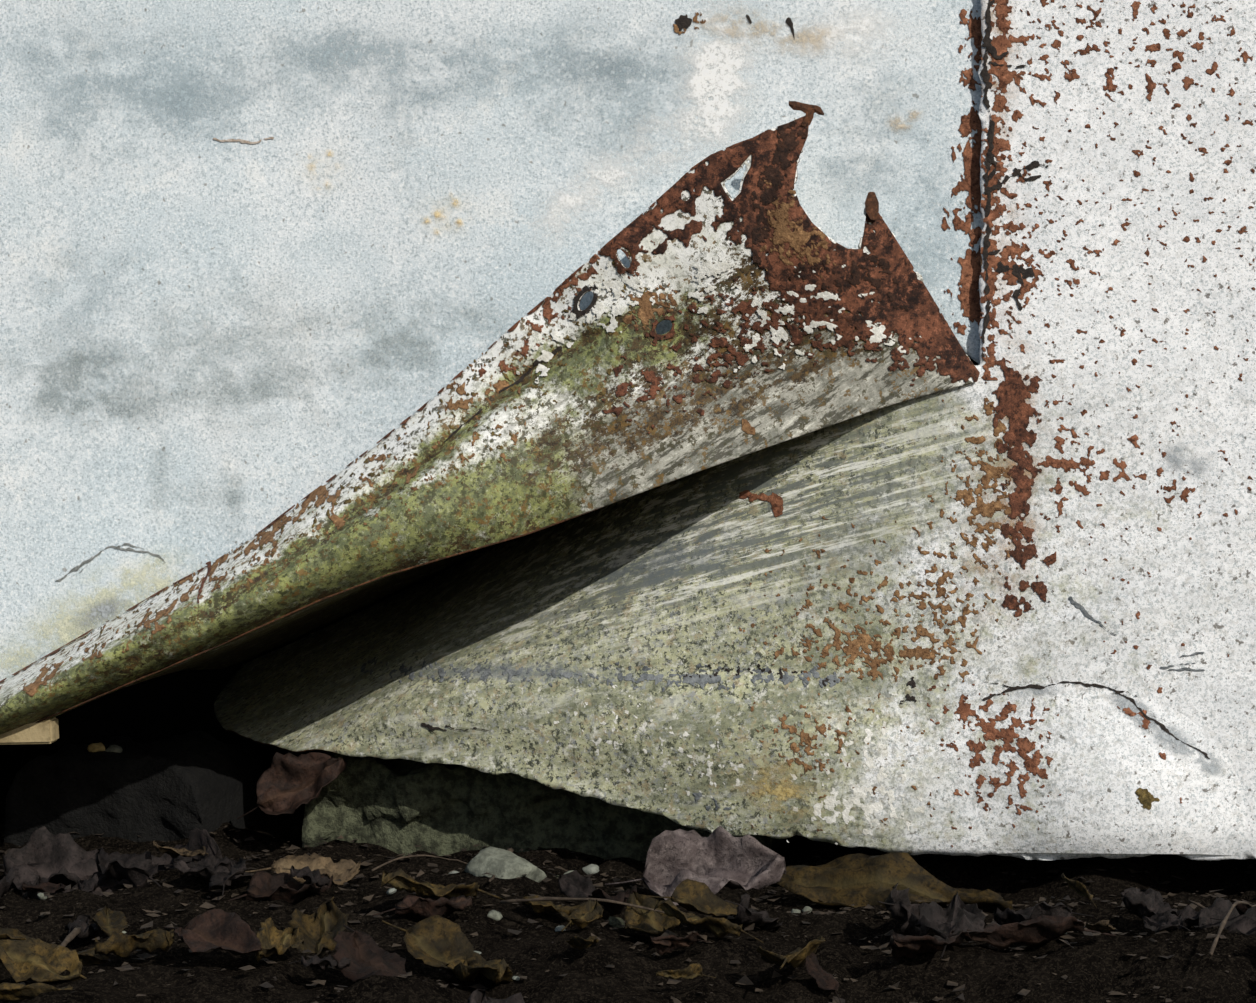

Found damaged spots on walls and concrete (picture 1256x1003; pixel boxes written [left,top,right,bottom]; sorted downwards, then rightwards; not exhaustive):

damp [293,32,406,84]
rust [1040,0,1235,156]
rust [1143,172,1256,268]
peeling [568,261,655,333]
peeling [733,266,921,372]
damp [40,352,131,416]
rust [0,0,1195,828]
crack [56,543,166,582]
spalling [0,664,290,753]
peeling [360,656,840,810]
peeling [790,710,930,845]
crack [982,681,1210,759]